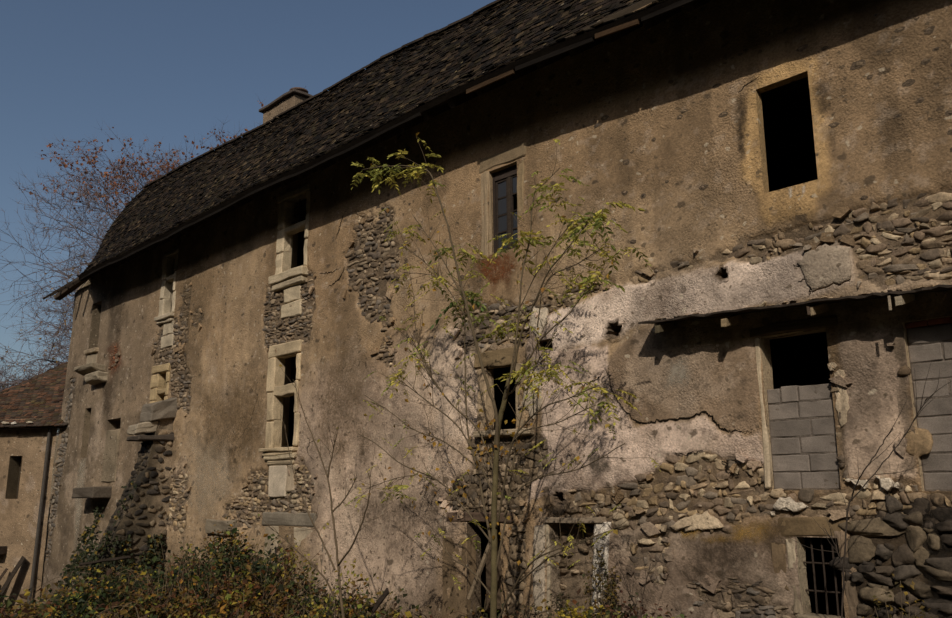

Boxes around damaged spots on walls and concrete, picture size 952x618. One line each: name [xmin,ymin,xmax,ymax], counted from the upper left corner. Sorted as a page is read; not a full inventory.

flaking render [150,282,204,417]
flaking render [167,463,192,534]
flaking render [222,456,318,532]
flaking render [342,205,407,368]
flaking render [437,430,548,618]
flaking render [517,356,544,420]
crack [572,371,752,434]
flaking render [448,186,952,359]
flaking render [549,322,952,618]